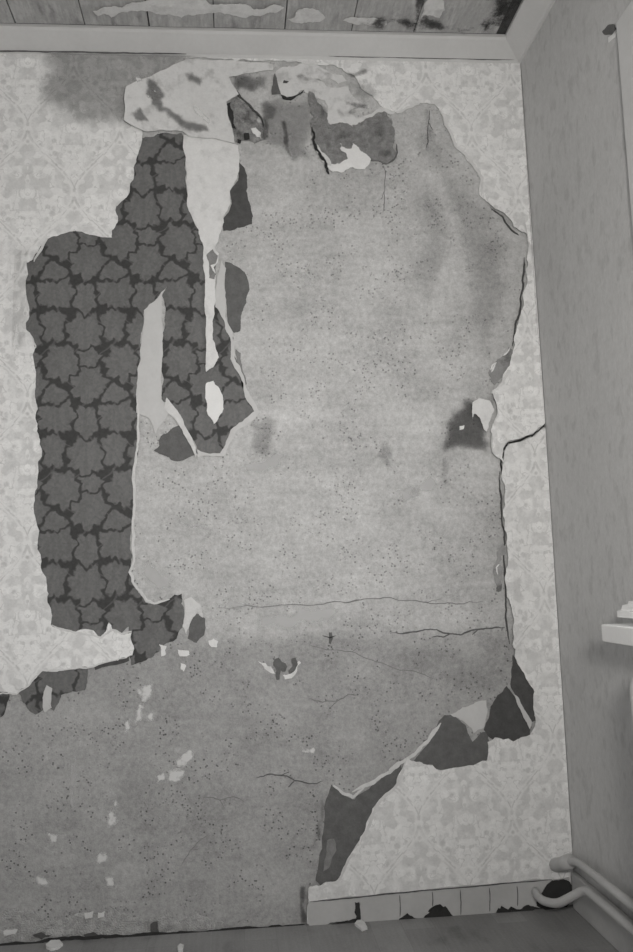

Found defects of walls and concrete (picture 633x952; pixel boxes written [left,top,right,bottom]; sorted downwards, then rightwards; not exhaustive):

peeling [93,0,284,18]
peeling [288,8,325,24]
peeling [343,17,387,27]
leakage [399,0,444,30]
peeling [421,0,445,18]
leakage [482,0,519,28]
leakage [237,77,258,90]
crack [500,425,544,474]
peeling [0,58,526,946]
crack [227,597,481,609]
crack [393,626,505,638]